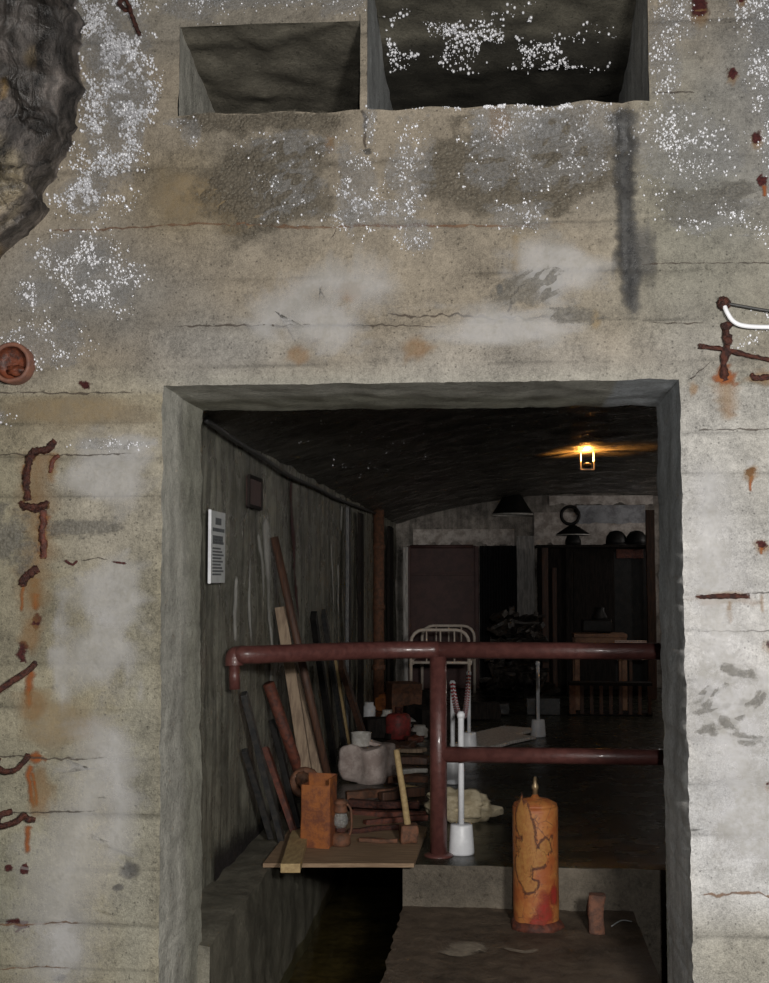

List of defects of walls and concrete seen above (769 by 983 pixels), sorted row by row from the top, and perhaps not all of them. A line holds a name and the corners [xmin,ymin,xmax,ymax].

leakage [383,9,420,73]
leakage [0,0,229,371]
leakage [423,0,769,313]
corrosion [20,587,42,630]
corrosion [16,641,35,706]
corrosion [26,752,46,806]